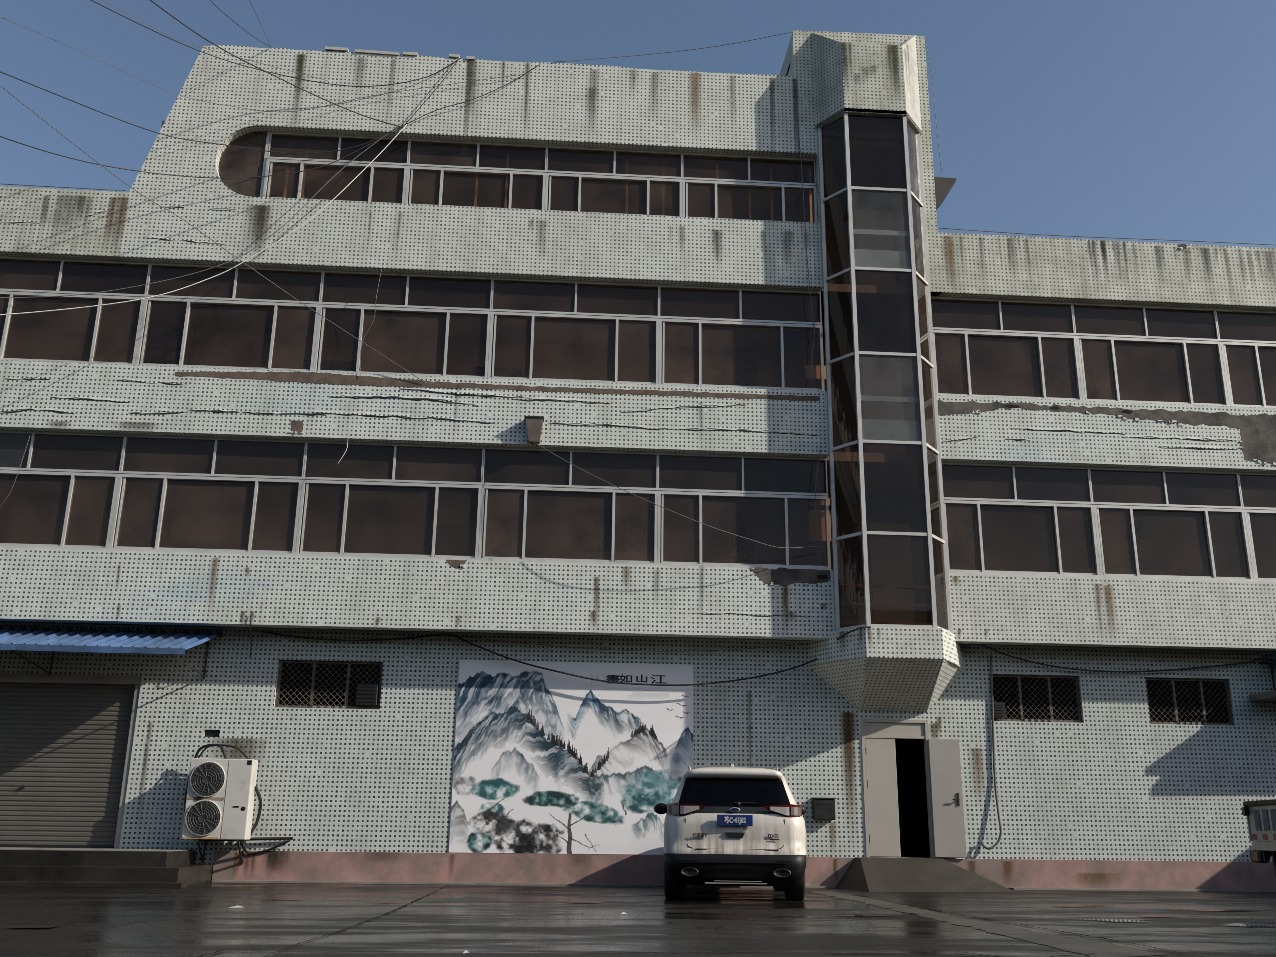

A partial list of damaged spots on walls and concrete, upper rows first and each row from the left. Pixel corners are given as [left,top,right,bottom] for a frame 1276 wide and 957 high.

water stain [466,60,476,105]
peeling [937,400,1276,465]
peeling [749,567,832,587]